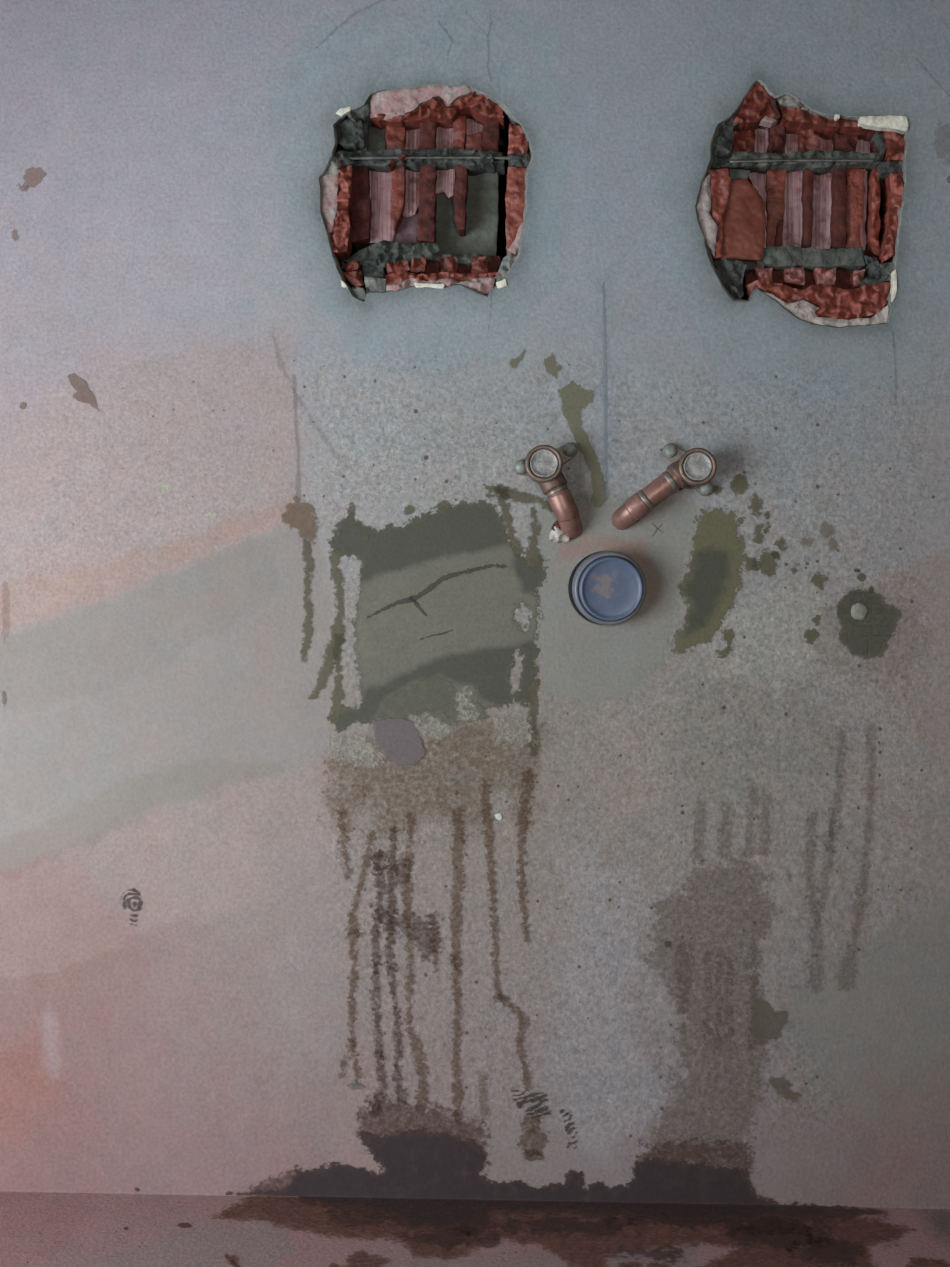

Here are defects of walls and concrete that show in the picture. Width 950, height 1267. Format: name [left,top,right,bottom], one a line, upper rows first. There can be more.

spalling [319,84,533,302]
spalling [695,80,908,328]
leakage [510,349,526,369]
leakage [543,353,607,507]
leakage [300,483,553,768]
crack [367,564,507,640]
leakage [671,471,837,658]
leakage [836,569,901,659]
leakage [225,1094,888,1231]